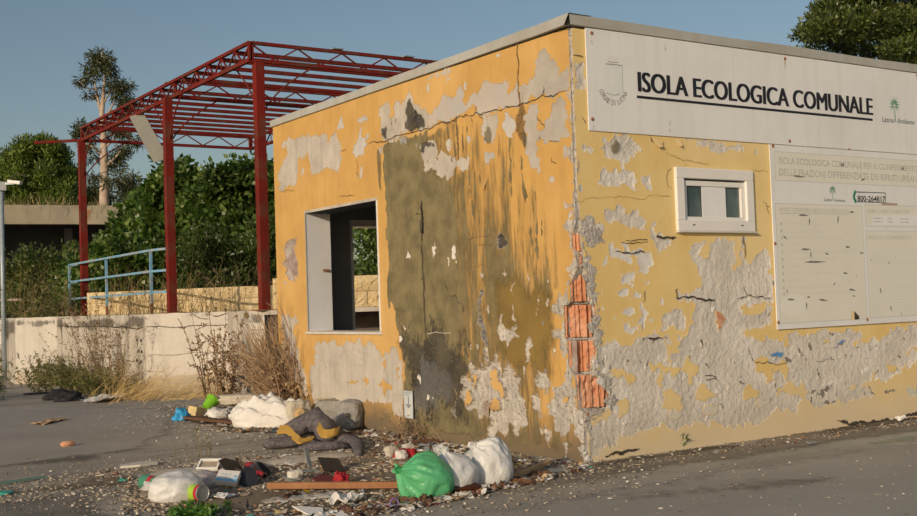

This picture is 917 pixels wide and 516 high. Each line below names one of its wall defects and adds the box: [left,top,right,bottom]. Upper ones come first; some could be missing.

peeling [277,115,344,193]
crack [341,43,567,173]
damp [436,115,472,159]
damp [484,127,535,203]
spalling [283,237,299,285]
crack [395,200,464,351]
damp [529,221,543,259]
peeling [352,31,917,470]
peeling [278,313,406,419]